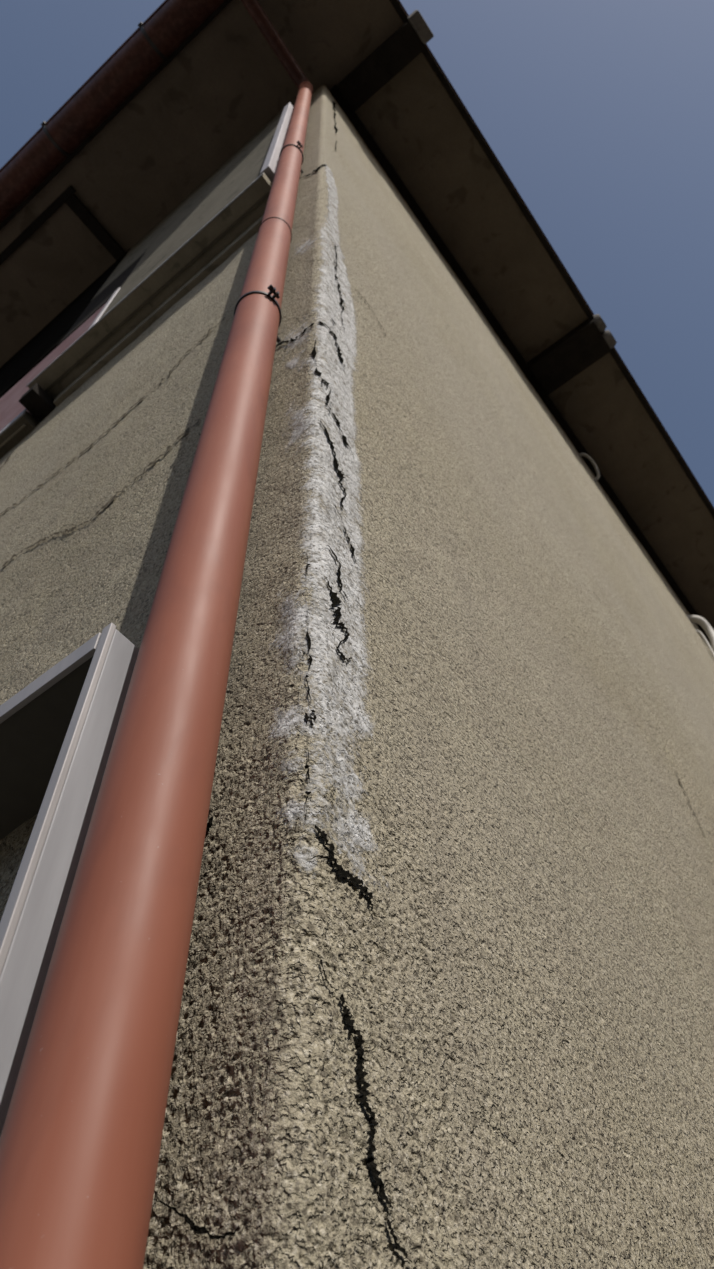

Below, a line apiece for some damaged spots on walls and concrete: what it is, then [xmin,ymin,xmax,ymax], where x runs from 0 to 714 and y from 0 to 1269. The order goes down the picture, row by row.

crack [1,420,199,567]
crack [0,317,225,515]
crack [276,245,386,915]
crack [320,959,412,1262]
crack [157,1201,239,1240]